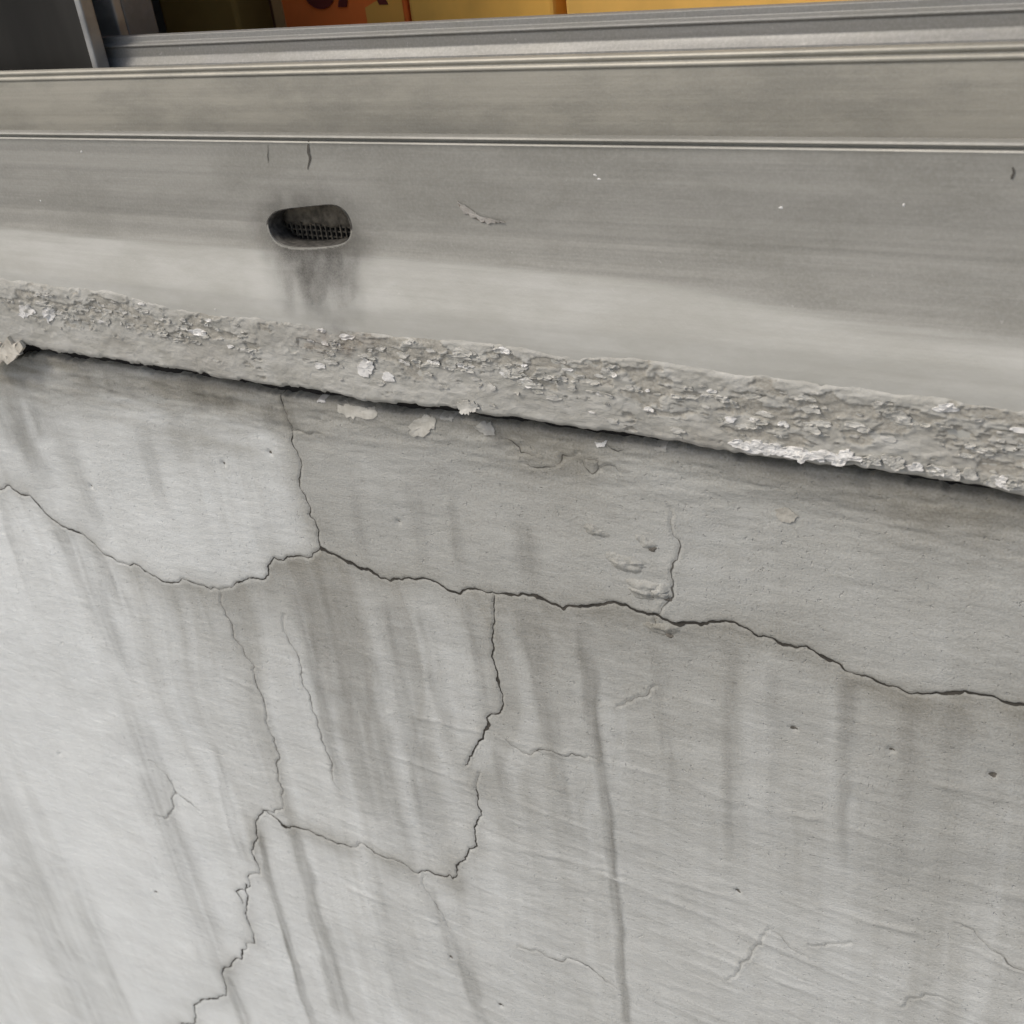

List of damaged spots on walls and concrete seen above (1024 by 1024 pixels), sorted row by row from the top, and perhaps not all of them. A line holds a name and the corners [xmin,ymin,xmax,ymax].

spalling [0,336,26,364]
peeling [18,292,257,355]
peeling [302,328,1024,491]
crack [0,344,1024,1024]